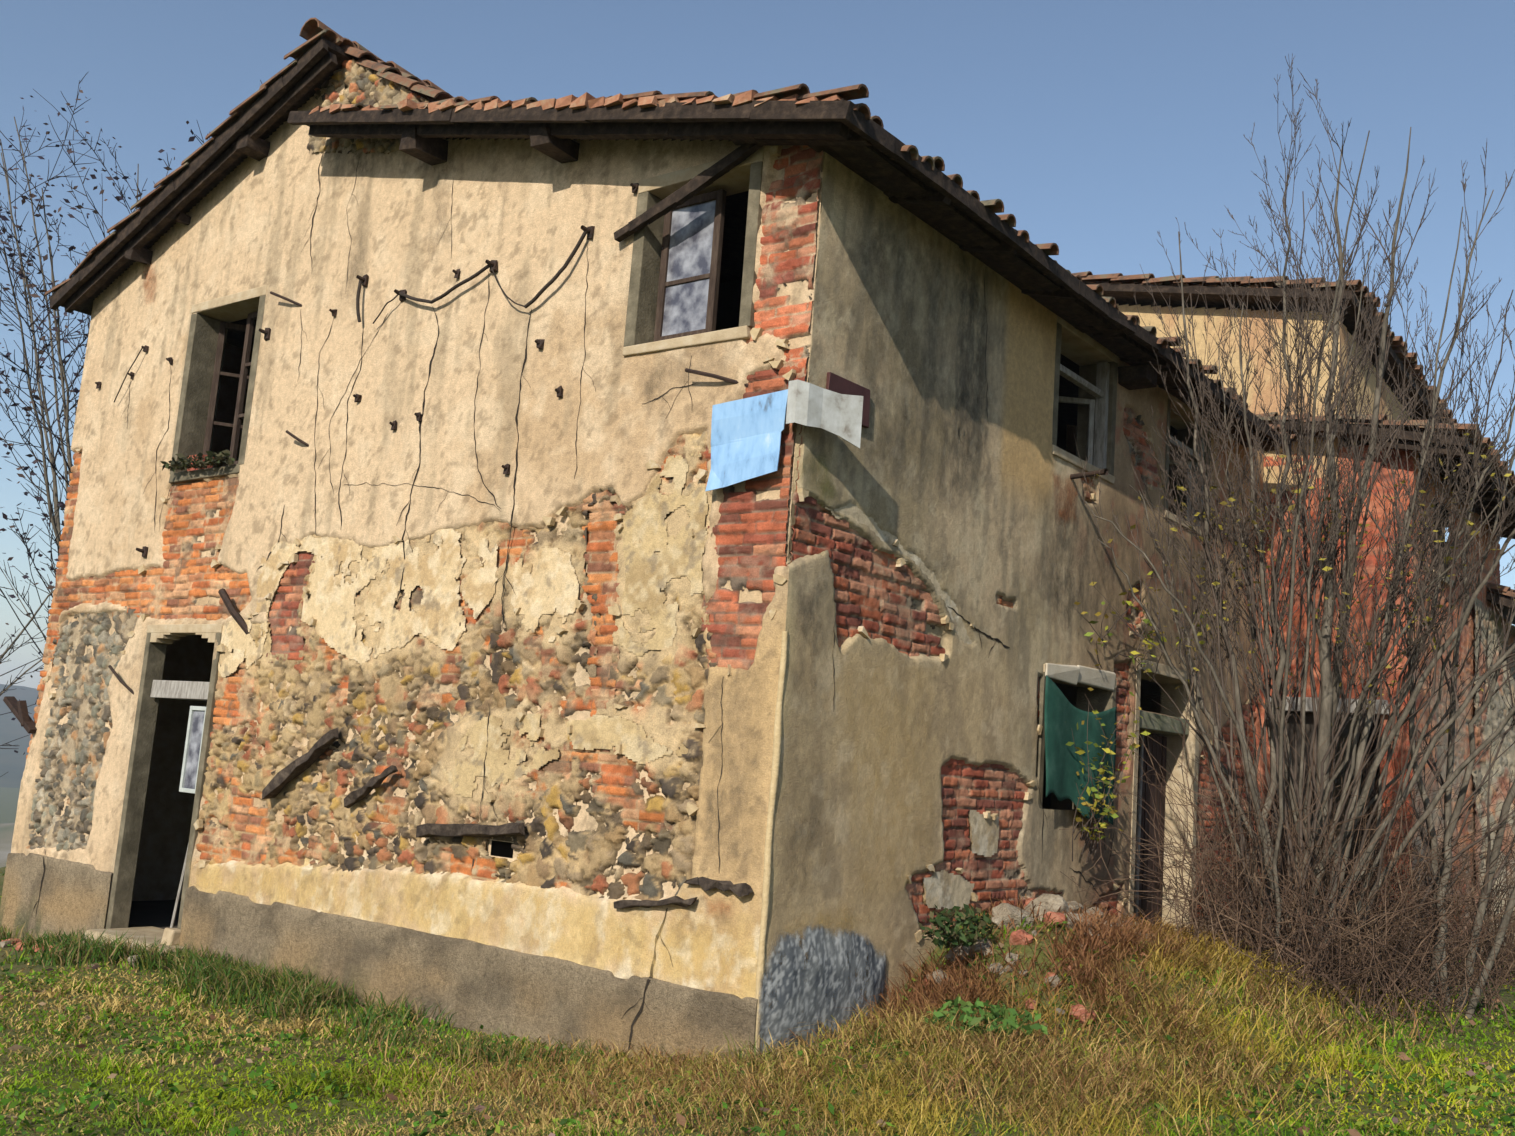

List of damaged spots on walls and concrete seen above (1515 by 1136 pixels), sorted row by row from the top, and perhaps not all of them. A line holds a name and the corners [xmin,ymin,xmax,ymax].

crack [256,154,532,631]
crack [574,246,596,478]
spalling [26,146,975,901]
spalling [905,758,1062,942]
crack [622,908,673,1049]